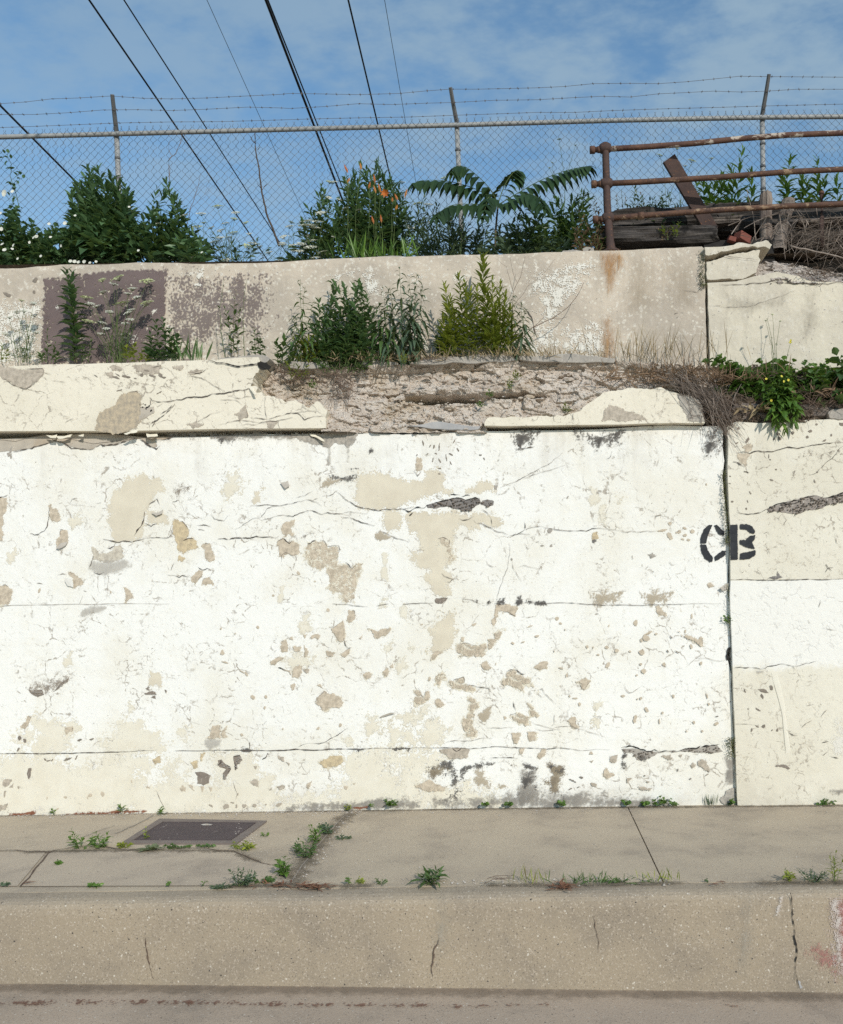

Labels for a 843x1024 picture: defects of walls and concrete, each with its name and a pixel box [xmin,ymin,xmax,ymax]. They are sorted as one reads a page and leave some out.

peeling [0,364,202,459]
spalling [767,422,843,514]
peeling [91,472,215,586]
spalling [249,360,732,690]
crack [641,509,787,606]
crack [0,748,215,756]
peeling [0,651,512,816]
crack [241,689,605,759]
water stain [426,760,669,808]
peeling [500,651,606,759]
spalling [569,744,723,791]
crack [790,893,798,981]